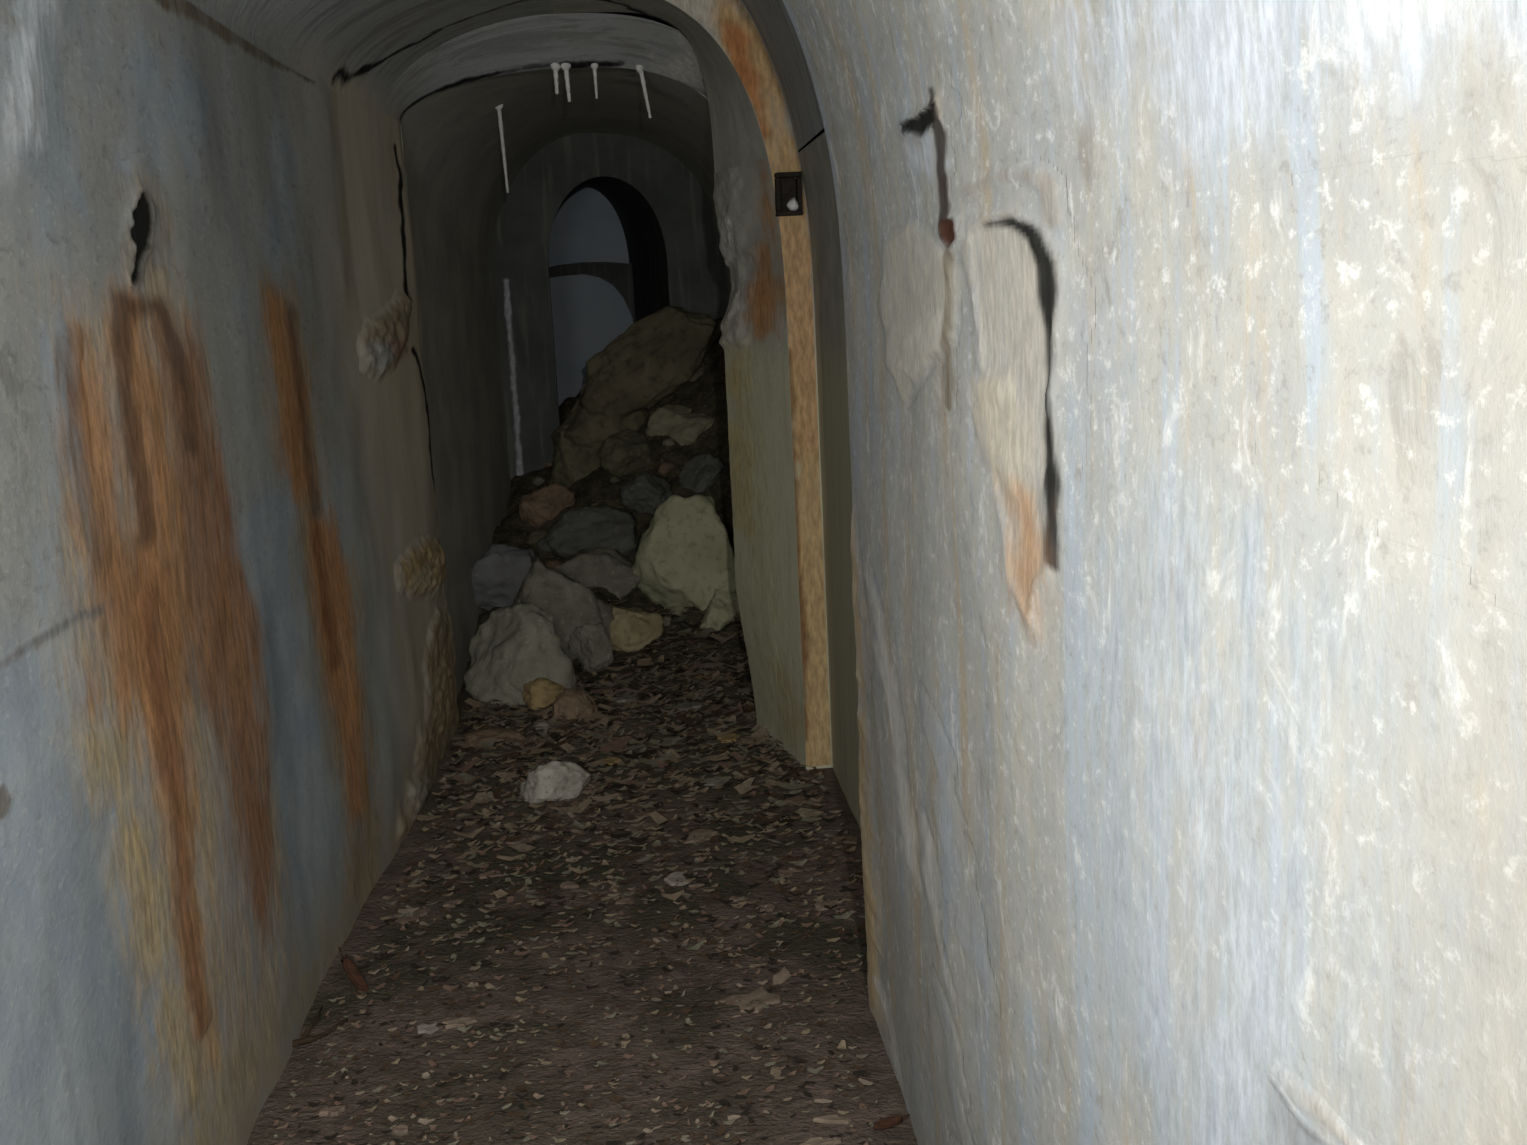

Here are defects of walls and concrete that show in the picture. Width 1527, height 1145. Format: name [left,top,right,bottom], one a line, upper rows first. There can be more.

crack [109,0,529,96]
crack [597,0,690,43]
crack [392,58,627,552]
spalling [713,164,758,350]
crack [927,80,959,415]
spalling [876,124,1095,663]
crack [0,607,91,674]
corrosion [0,222,390,1145]